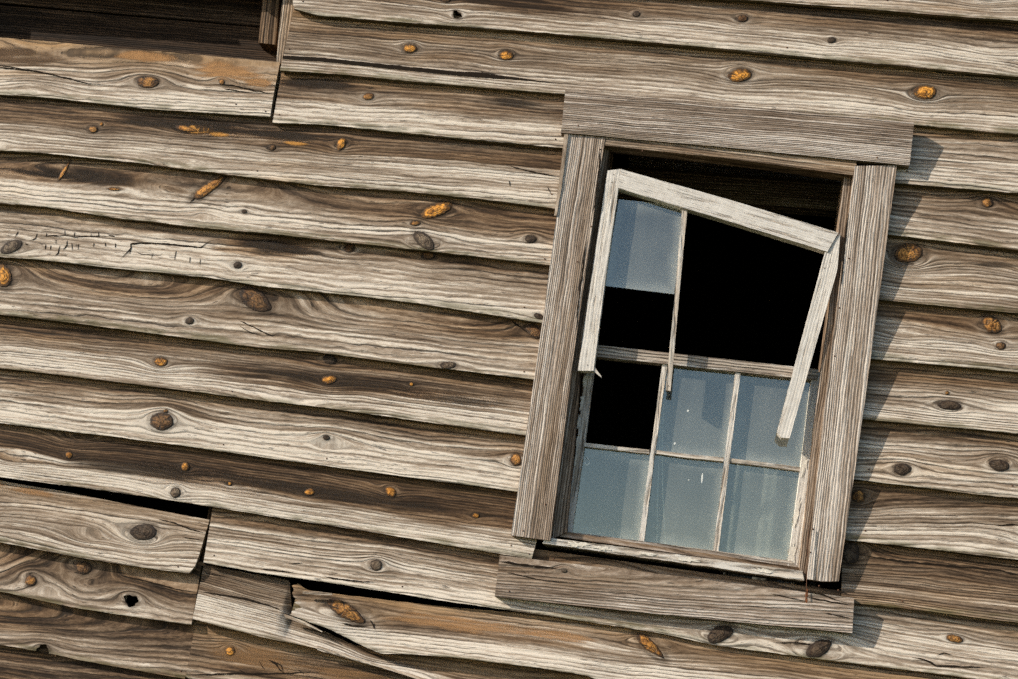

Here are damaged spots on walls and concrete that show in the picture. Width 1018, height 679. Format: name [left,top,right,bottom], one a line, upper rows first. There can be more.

crack [14,231,217,263]